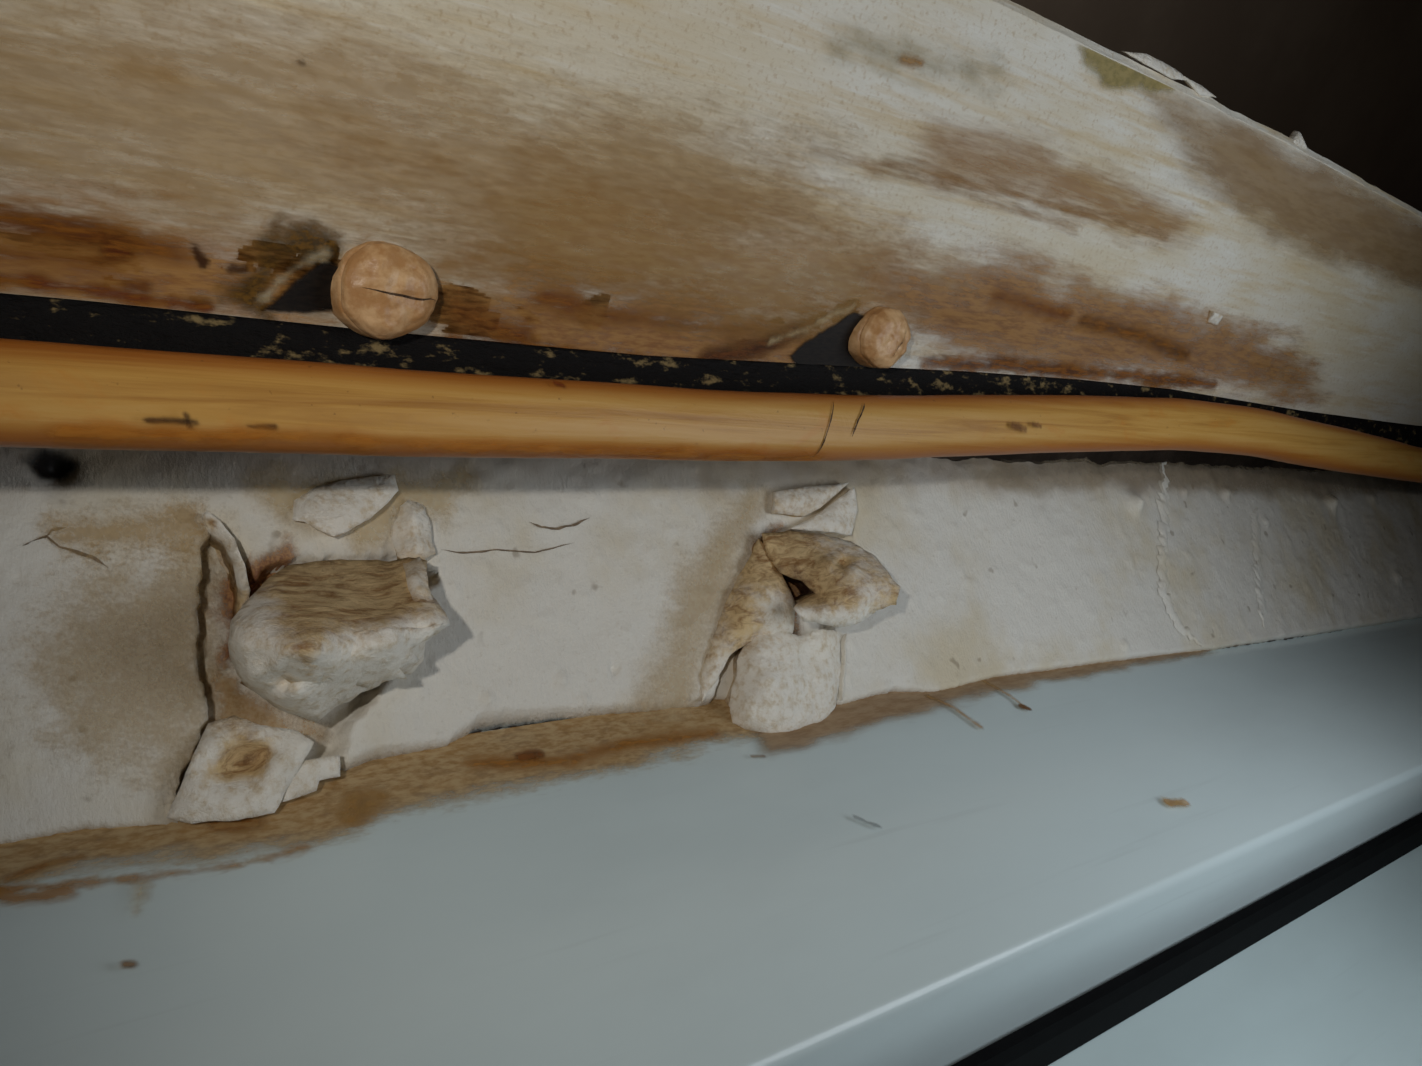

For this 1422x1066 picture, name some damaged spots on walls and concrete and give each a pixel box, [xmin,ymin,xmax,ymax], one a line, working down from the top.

damp [1084,48,1174,91]
damp [0,19,904,329]
damp [934,137,1180,235]
damp [1173,114,1422,285]
spalling [262,251,338,313]
damp [53,424,304,443]
damp [412,442,823,461]